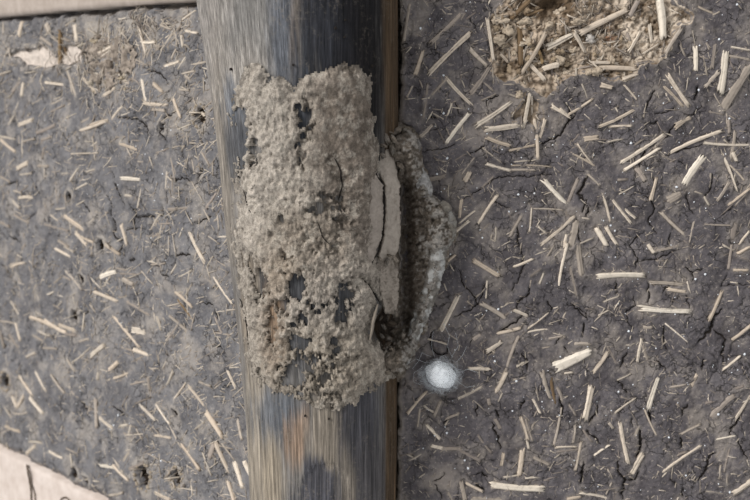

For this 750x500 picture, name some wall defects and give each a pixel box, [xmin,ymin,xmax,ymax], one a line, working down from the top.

spalling [7,42,82,70]
spalling [488,0,694,129]
crack [543,102,575,144]
crack [646,87,702,166]
crack [576,176,589,241]
crack [629,150,671,268]
crack [502,227,530,330]
crack [615,283,668,327]
crack [698,309,726,368]
crack [475,405,501,449]
crack [586,404,600,444]
crack [617,411,651,497]